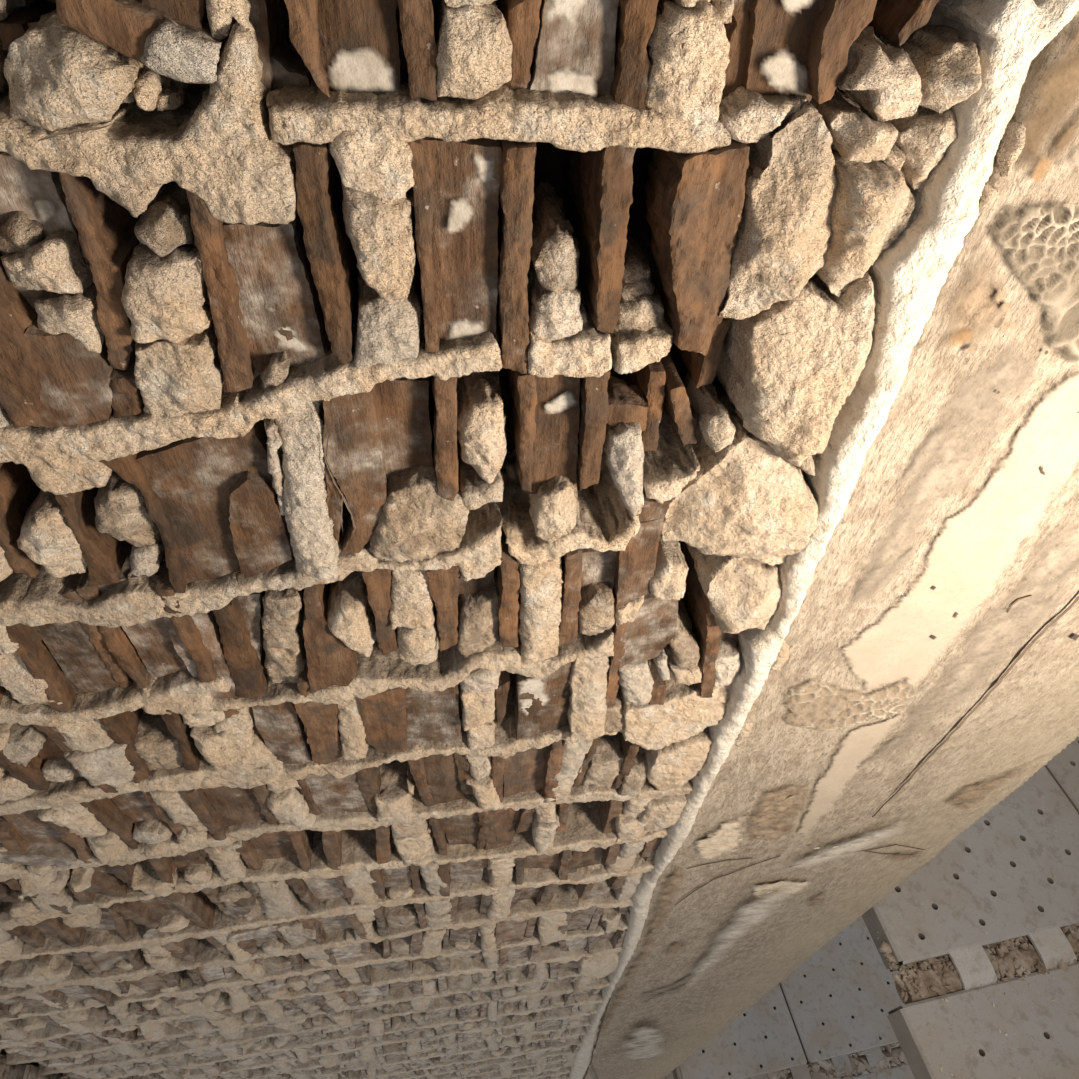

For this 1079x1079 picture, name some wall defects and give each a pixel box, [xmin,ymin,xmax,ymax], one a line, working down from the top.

crack [872,596,1079,818]
spalling [696,786,807,859]
crack [841,844,925,855]
crack [675,855,800,905]
flaking render [753,881,810,900]